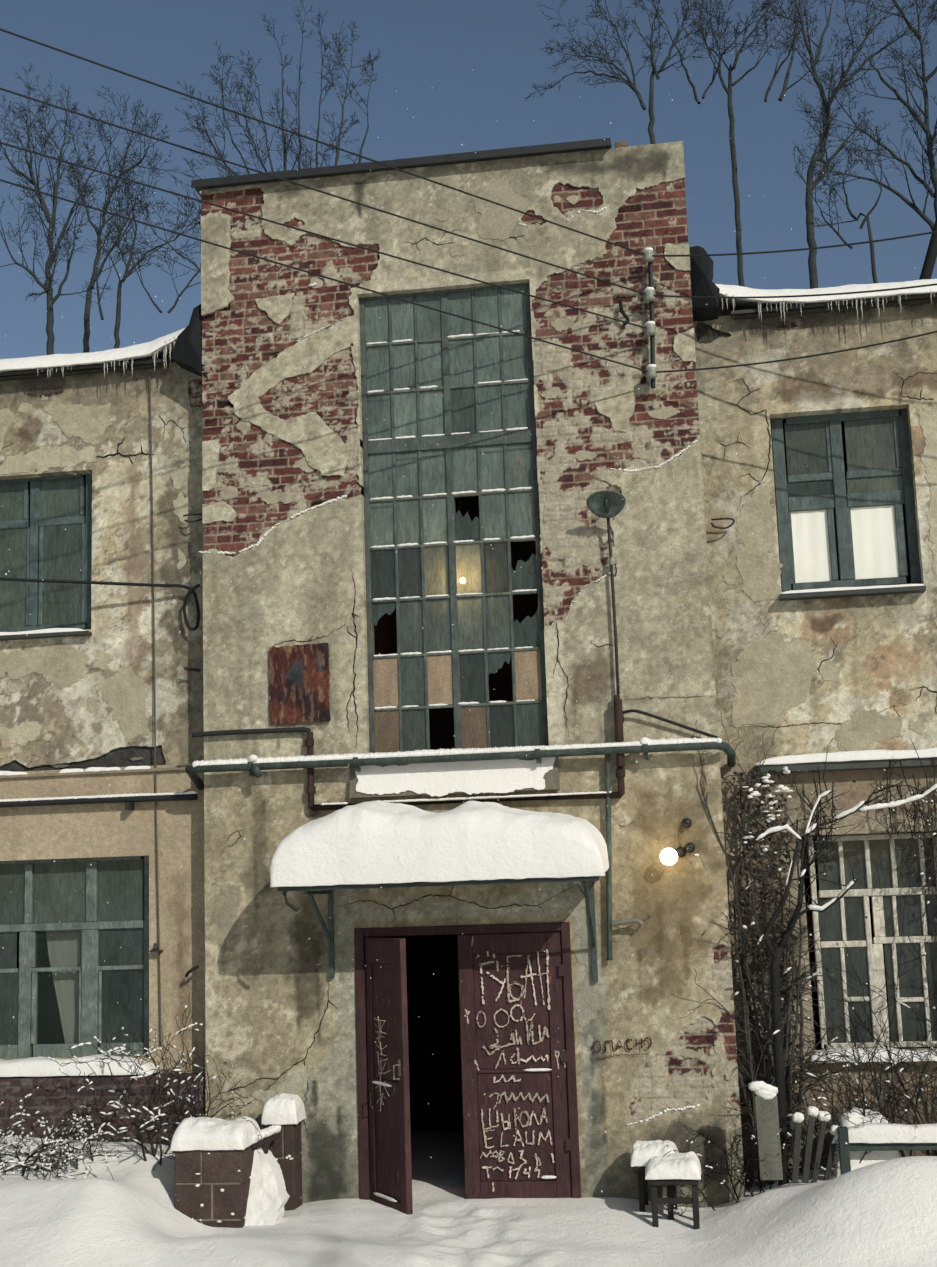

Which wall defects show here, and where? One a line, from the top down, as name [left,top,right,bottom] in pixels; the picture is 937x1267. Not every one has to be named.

peeling [474,175,546,240]
flaking render [169,188,380,586]
flaking render [532,178,731,629]
peeling [722,484,783,602]
peeling [0,643,166,772]
crack [750,722,842,748]
crack [882,686,937,717]
crack [338,884,585,922]
flaking render [626,944,740,1126]
damp [309,1081,346,1198]